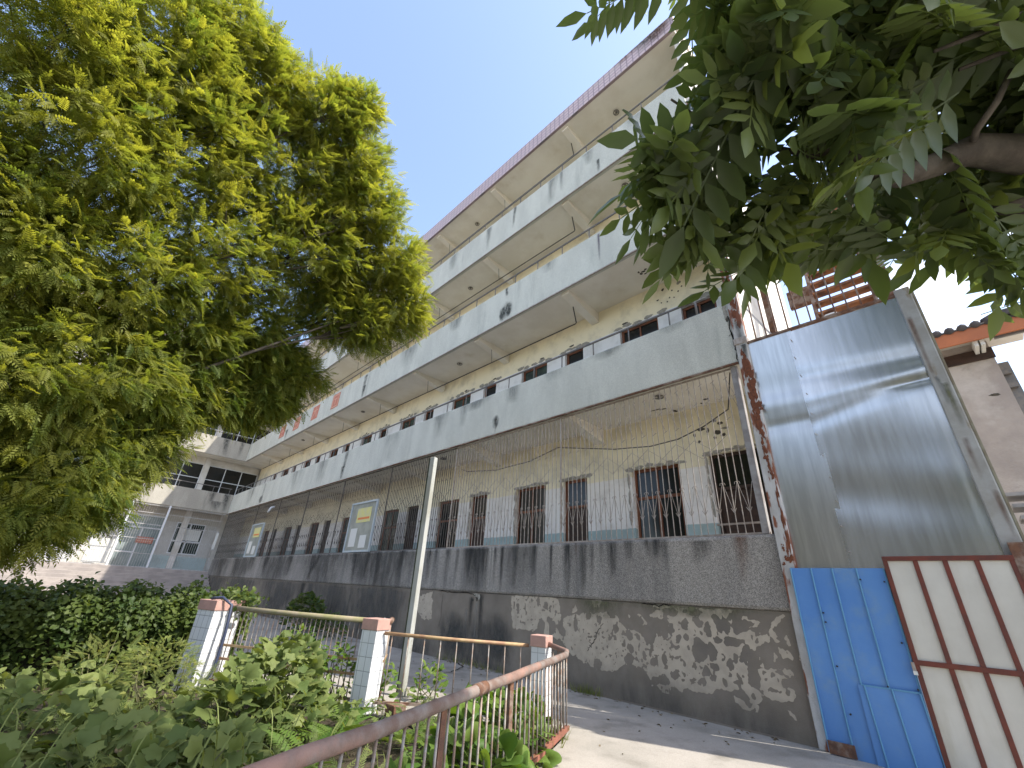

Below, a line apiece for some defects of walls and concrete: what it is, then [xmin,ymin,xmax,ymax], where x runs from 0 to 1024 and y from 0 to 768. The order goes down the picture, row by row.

rust [740,344,794,565]
leakage [467,546,536,571]
peeling [511,595,808,721]